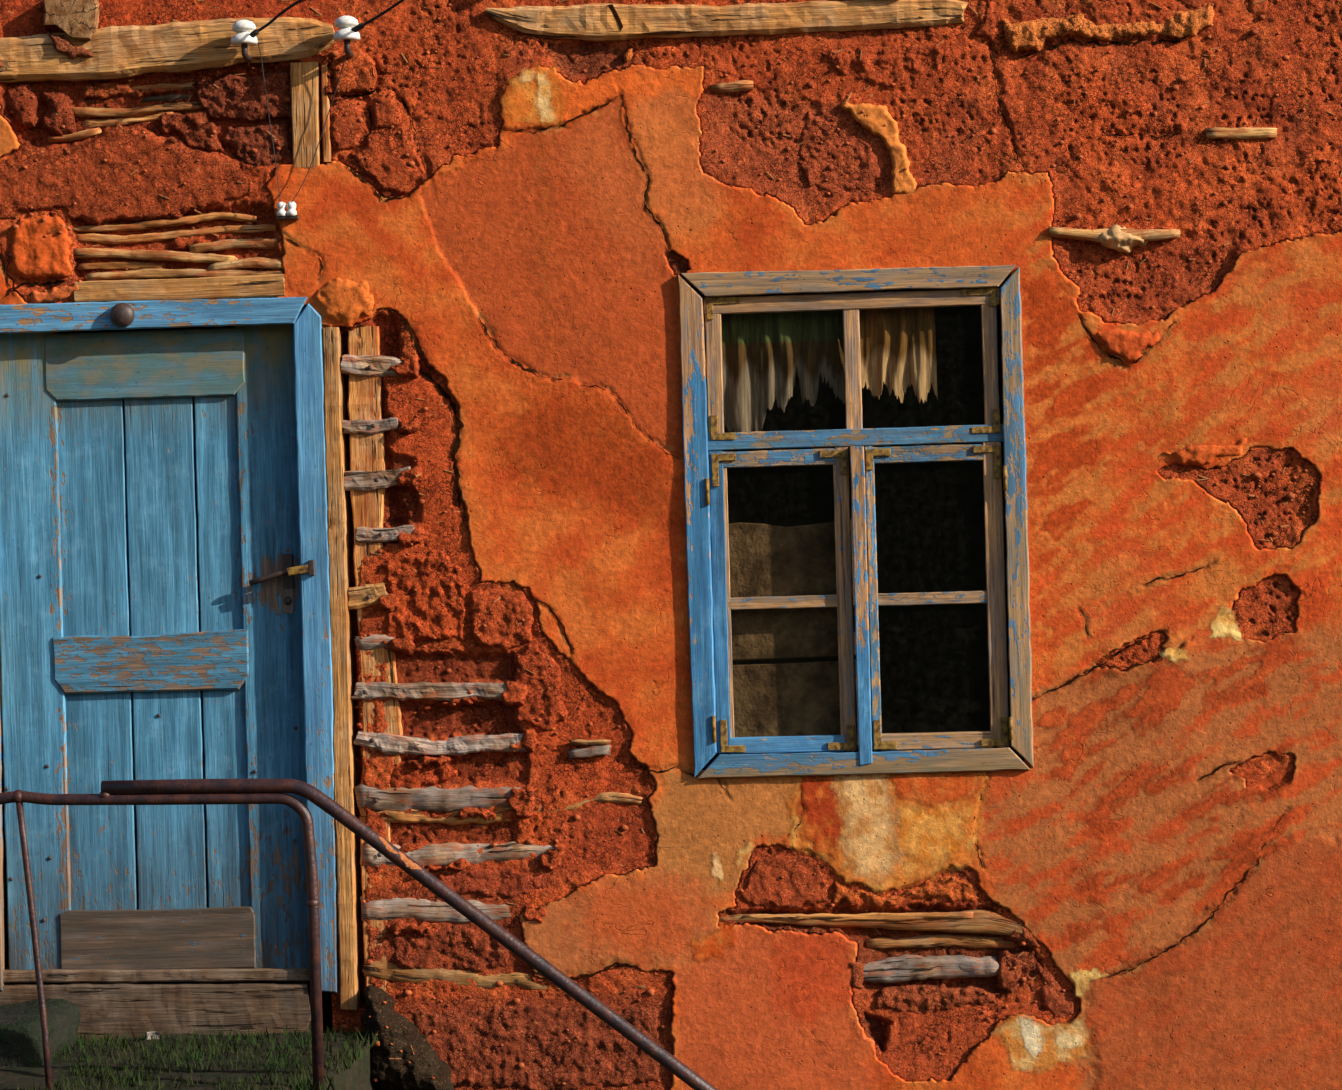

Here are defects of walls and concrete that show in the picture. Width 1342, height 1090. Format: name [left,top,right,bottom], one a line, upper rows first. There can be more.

flaking render [322,308,675,1090]